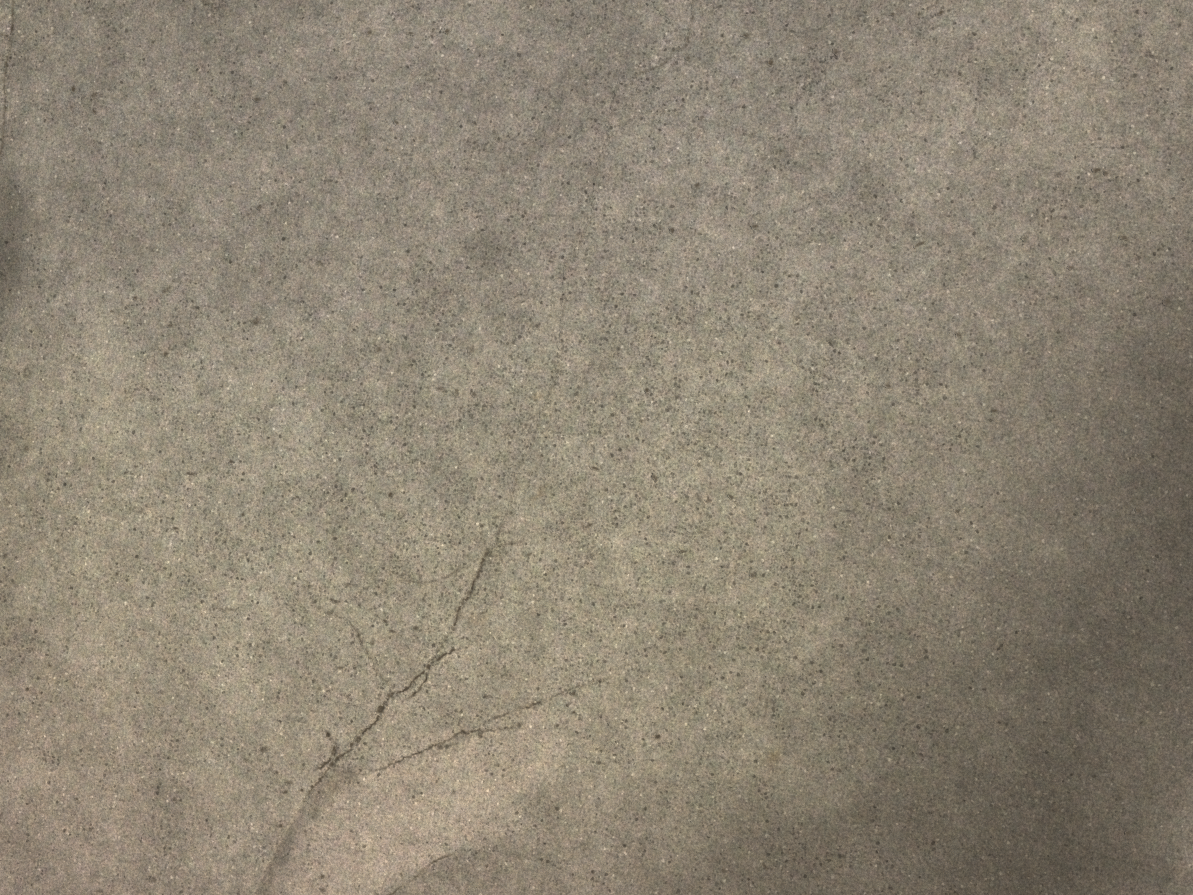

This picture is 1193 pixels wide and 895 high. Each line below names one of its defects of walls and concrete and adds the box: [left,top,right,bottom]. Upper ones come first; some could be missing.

crack [299,0,695,805]
crack [388,853,464,895]